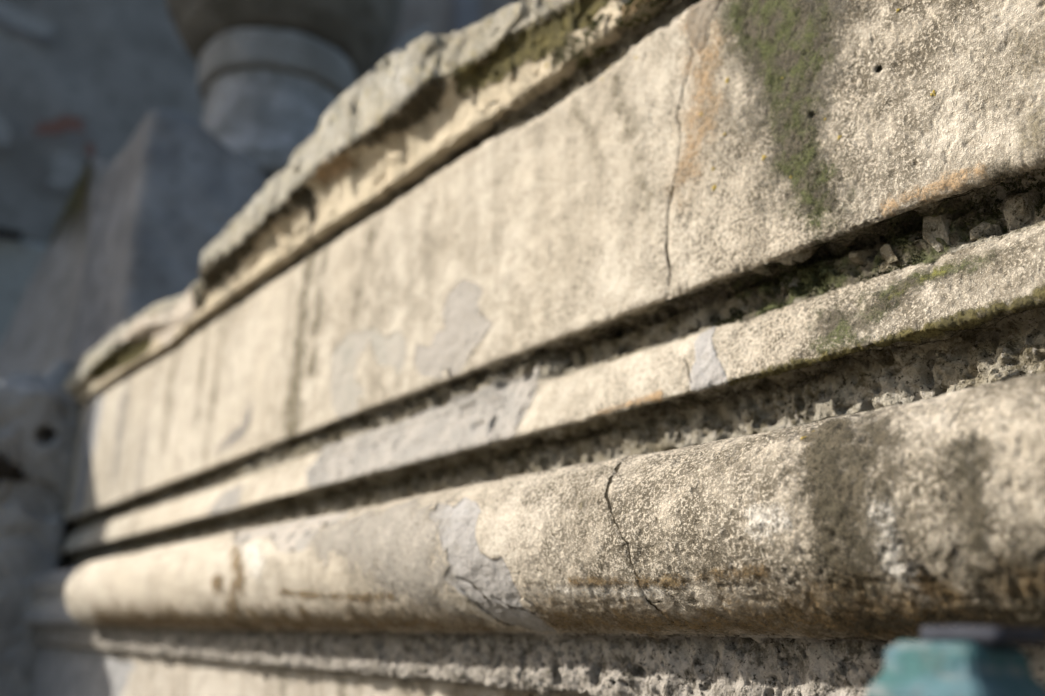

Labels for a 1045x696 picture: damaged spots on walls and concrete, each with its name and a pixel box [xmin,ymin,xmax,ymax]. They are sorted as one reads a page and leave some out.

water stain [338,77,447,154]
water stain [393,22,431,52]
crack [665,40,693,293]
water stain [503,0,1025,377]
water stain [104,182,491,514]
peeling [331,279,493,418]
spalling [429,497,557,633]
crack [604,458,671,621]